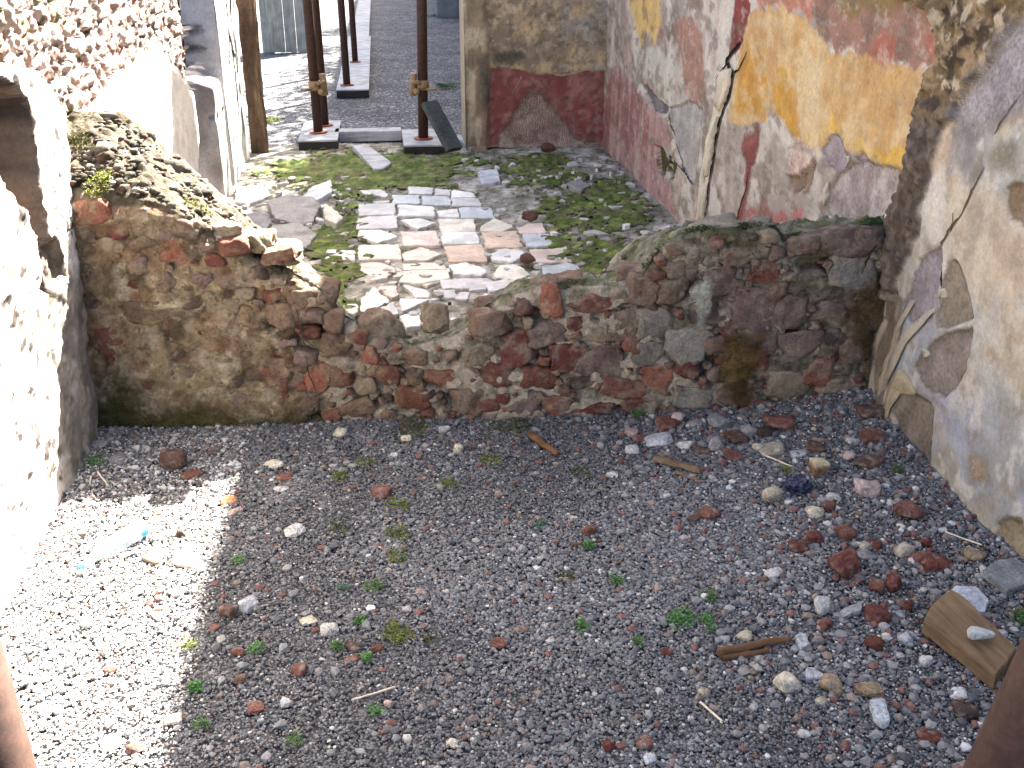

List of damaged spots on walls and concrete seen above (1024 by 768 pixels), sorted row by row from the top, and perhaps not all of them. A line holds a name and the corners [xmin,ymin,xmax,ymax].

spalling [642,64,735,221]
crack [669,39,746,218]
spalling [788,134,900,219]
crack [940,168,984,286]
crack [994,91,1024,134]
leakage [719,333,766,410]
peeling [872,247,974,464]